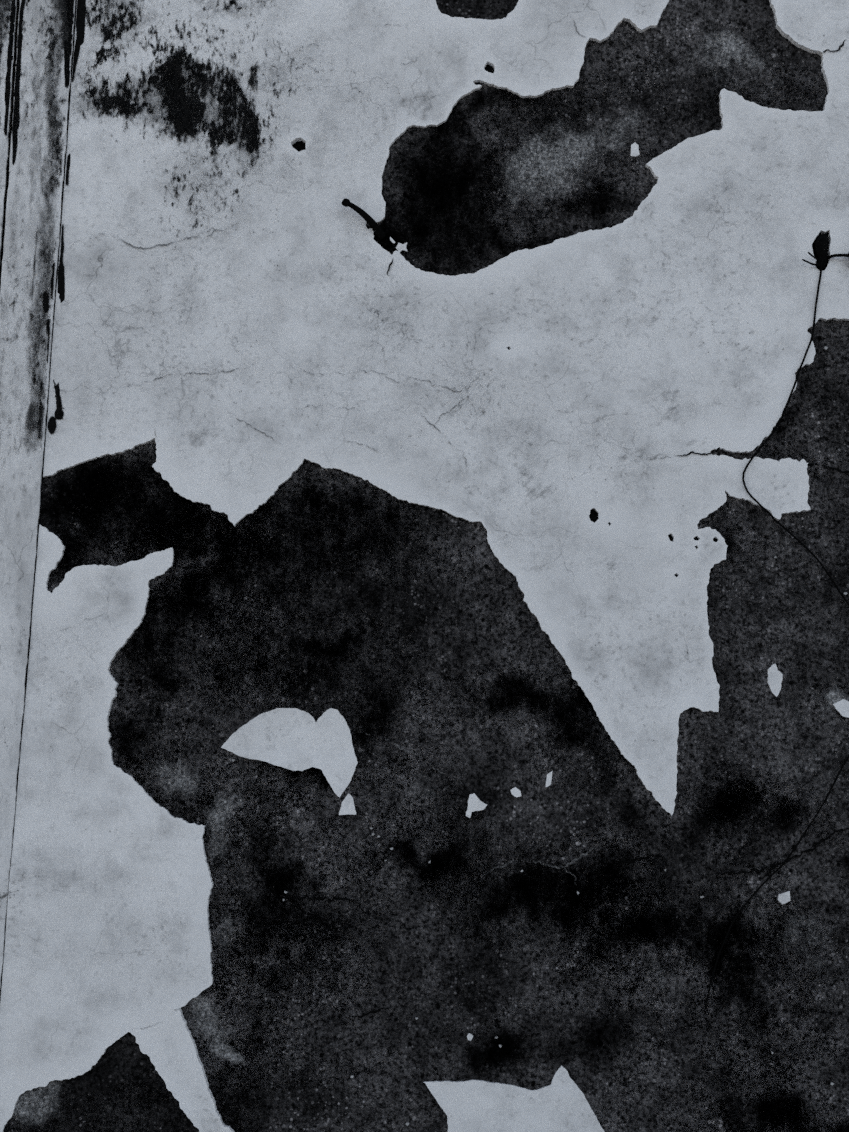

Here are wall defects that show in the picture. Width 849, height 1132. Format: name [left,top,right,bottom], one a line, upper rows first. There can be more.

peeling [366,0,828,276]
damp [0,0,292,444]
peeling [40,467,153,567]
peeling [97,439,157,465]
crack [640,451,712,459]
crack [807,463,849,476]
peeling [47,568,65,593]
peeling [108,319,849,1132]
crack [697,828,849,878]
peeling [4,1032,199,1132]